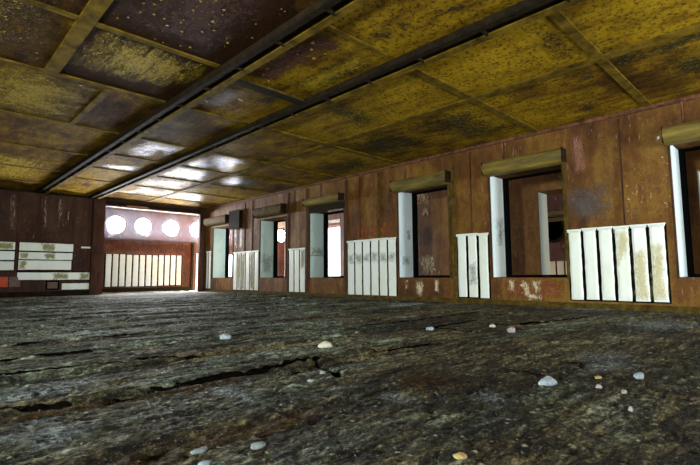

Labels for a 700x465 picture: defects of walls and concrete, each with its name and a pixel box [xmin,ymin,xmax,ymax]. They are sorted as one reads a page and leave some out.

damp [611,35,700,73]
peeling [509,280,540,300]
crack [0,333,201,375]
crack [102,355,353,406]
crack [0,401,74,412]